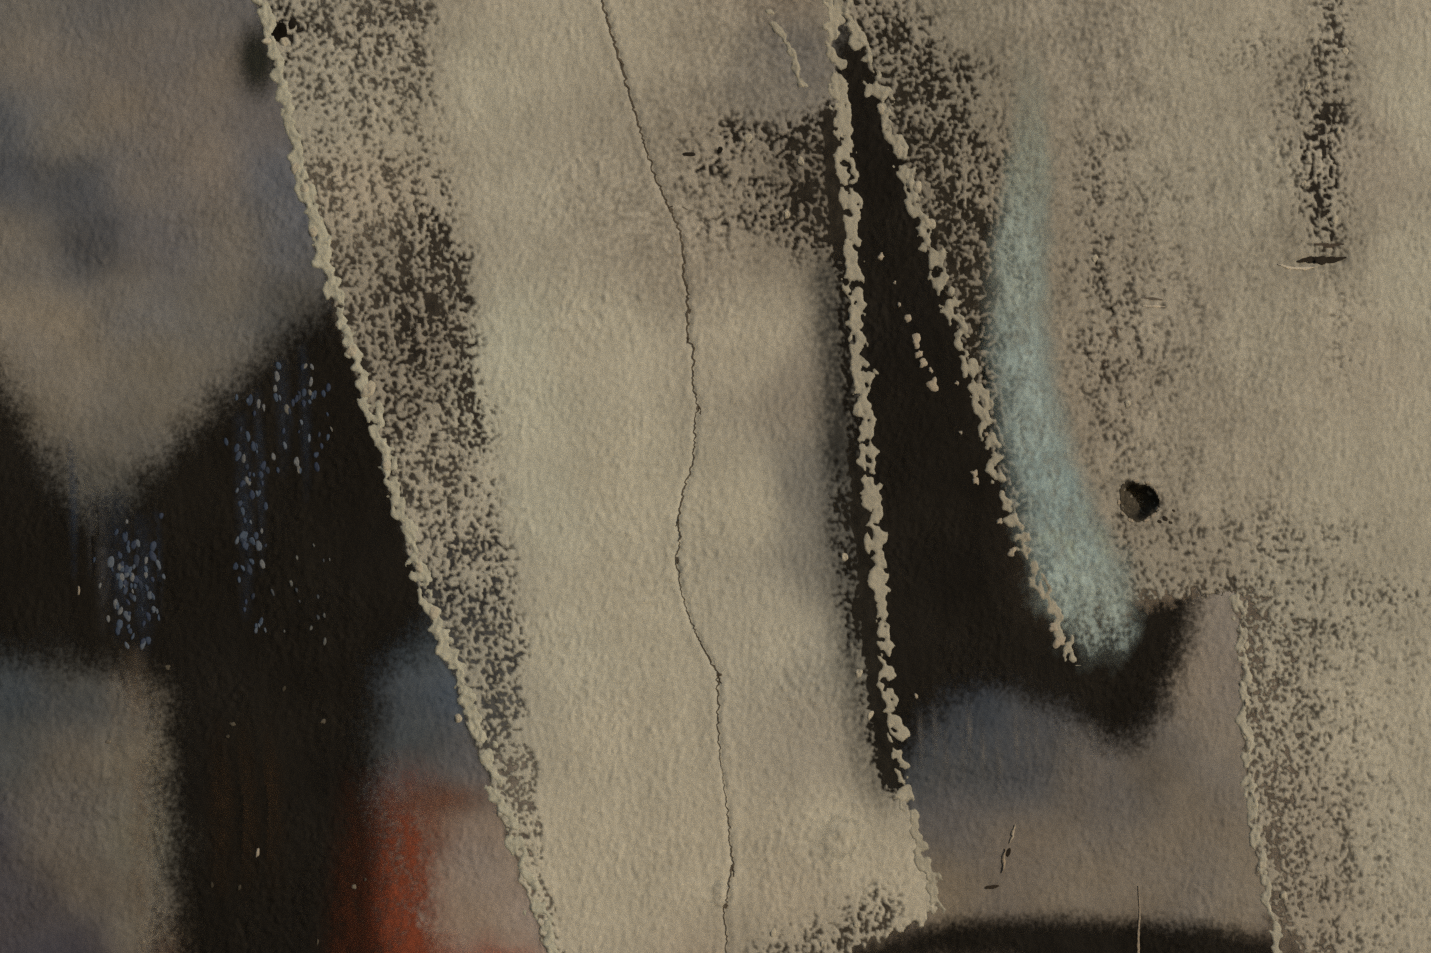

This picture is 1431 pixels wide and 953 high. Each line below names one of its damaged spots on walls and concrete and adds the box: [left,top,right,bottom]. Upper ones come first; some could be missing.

peeling [261,0,431,106]
peeling [843,0,1019,384]
peeling [1087,321,1118,383]
spalling [224,362,333,583]
peeling [290,162,541,861]
crack [601,0,735,953]
hole [1117,479,1175,524]
spalling [93,519,165,649]
spalling [243,589,275,633]
peeling [832,425,904,792]
peeling [1096,580,1205,617]
peeling [984,825,1015,889]